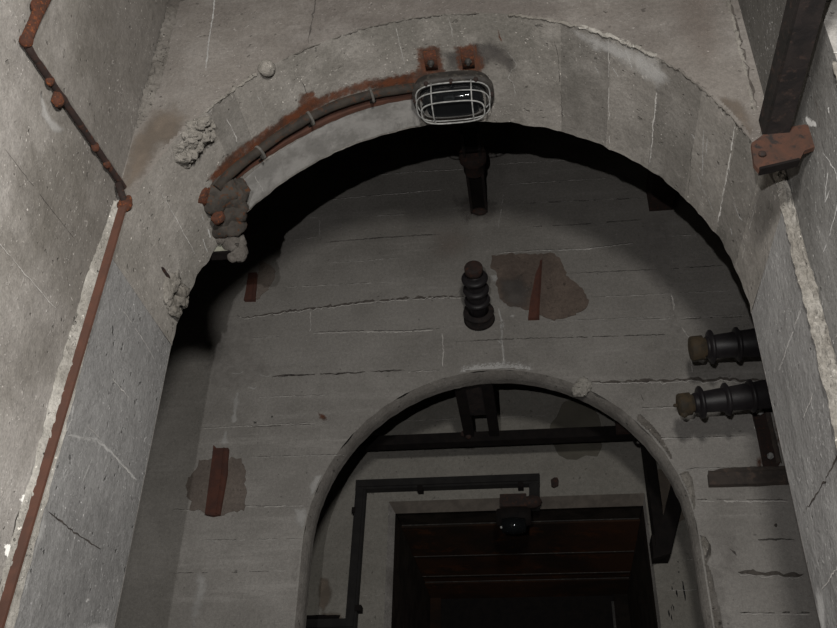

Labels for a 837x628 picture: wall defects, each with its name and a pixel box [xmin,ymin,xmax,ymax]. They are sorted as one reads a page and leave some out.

corrosion [211,46,445,182]
crack [726,0,757,111]